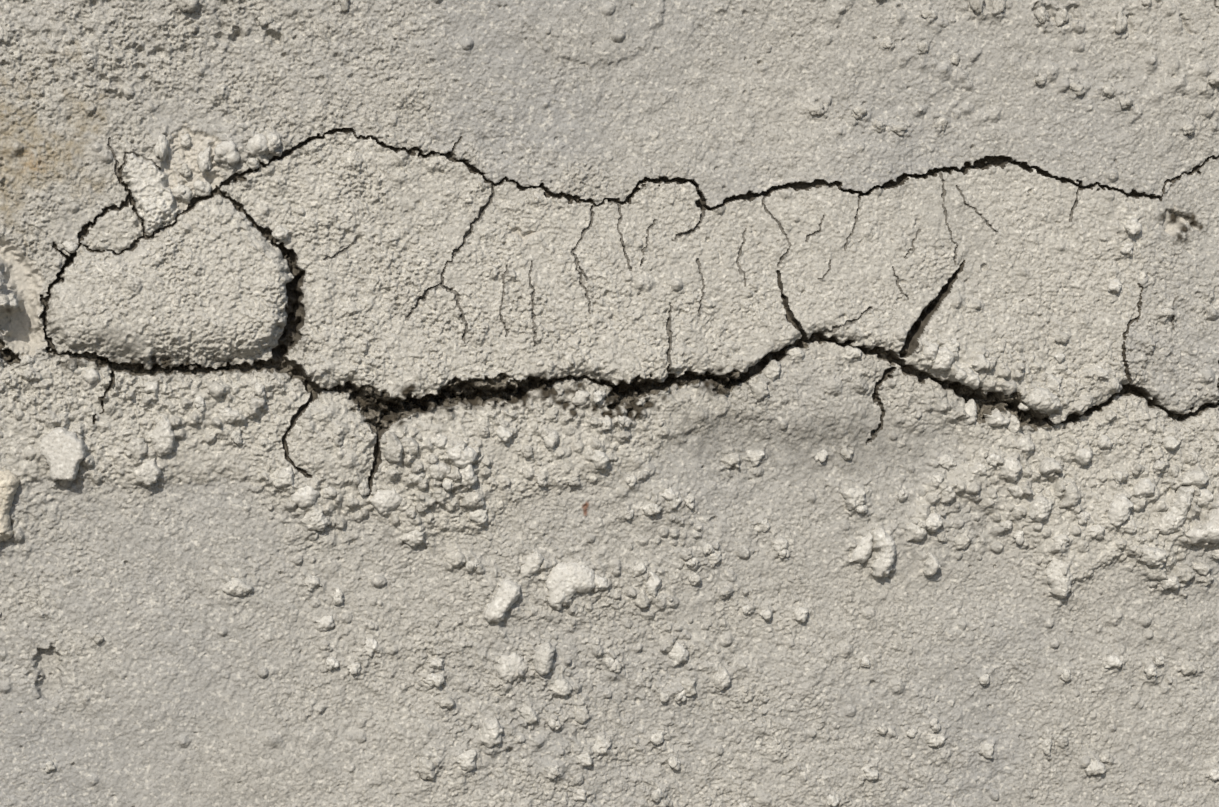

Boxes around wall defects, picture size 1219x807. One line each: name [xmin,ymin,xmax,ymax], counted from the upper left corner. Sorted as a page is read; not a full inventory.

crack [0,127,1219,497]